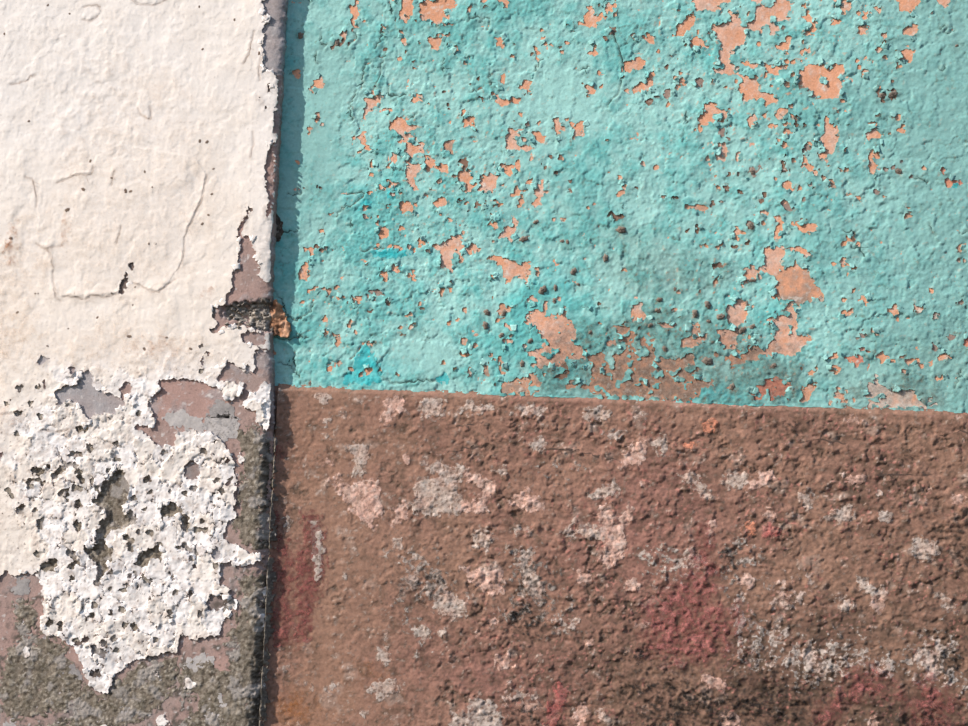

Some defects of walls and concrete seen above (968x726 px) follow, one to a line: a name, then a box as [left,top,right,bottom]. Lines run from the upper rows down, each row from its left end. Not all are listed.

peeling [820,0,881,35]
peeling [258,0,301,217]
peeling [855,0,926,198]
peeling [940,167,963,188]
peeling [298,0,849,401]
peeling [831,232,860,276]
peeling [837,288,872,318]
peeling [887,288,940,322]
peeling [747,326,937,409]
peeling [932,334,968,361]
peeling [0,207,292,726]